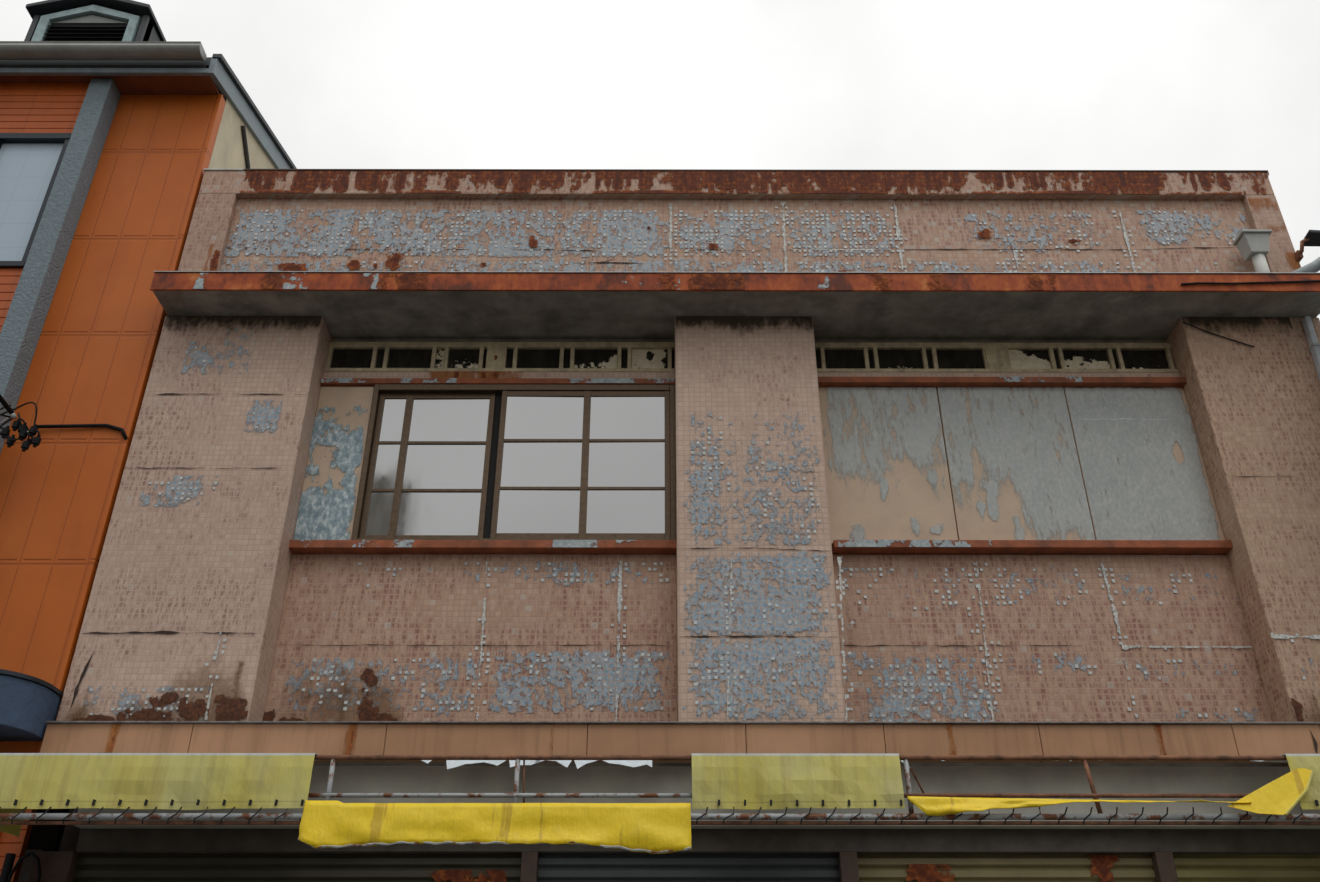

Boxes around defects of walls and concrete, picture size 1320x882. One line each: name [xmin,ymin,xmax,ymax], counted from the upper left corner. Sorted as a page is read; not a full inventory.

rust [240,171,1277,208]
rust [655,273,748,290]
peeling [193,206,1250,289]
peeling [64,349,1226,721]
peeling [1127,647,1244,720]